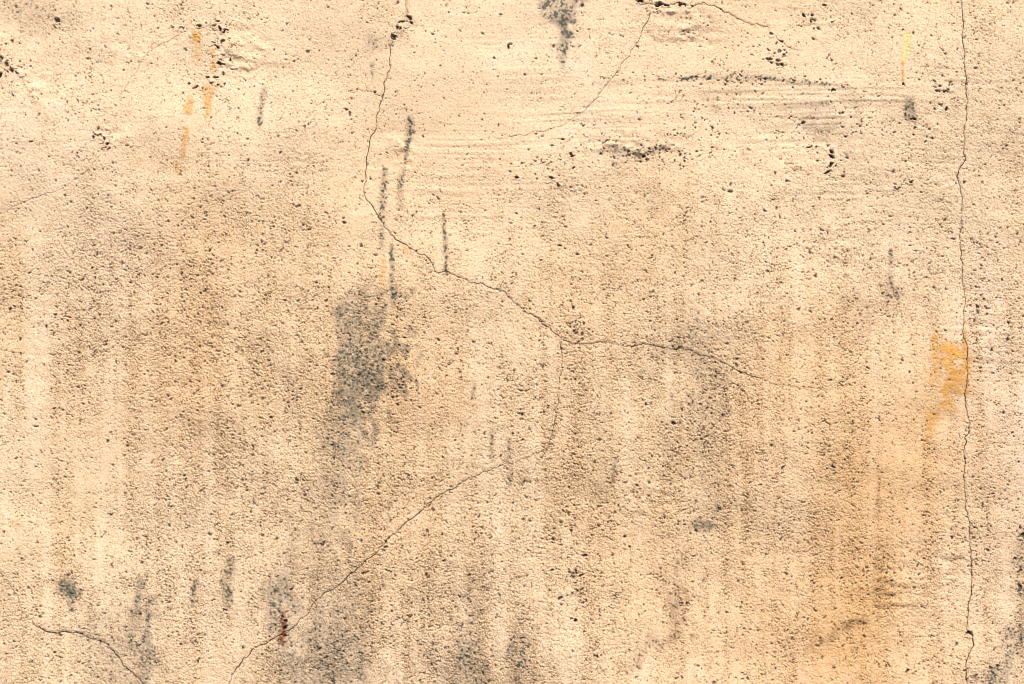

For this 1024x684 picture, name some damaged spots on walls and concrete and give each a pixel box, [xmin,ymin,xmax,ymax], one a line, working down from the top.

leakage [542,0,584,63]
leakage [327,234,412,471]
crack [231,3,863,678]
corrosion [929,335,971,430]
crack [0,572,142,682]